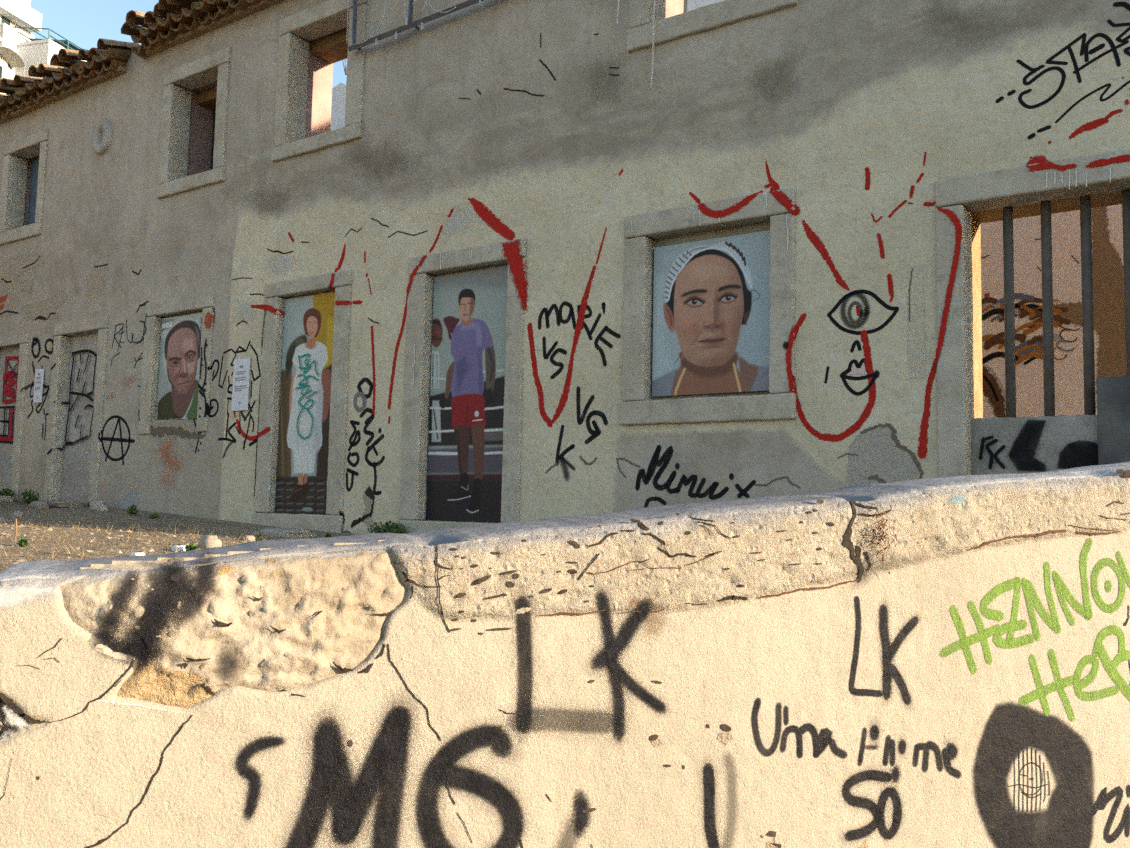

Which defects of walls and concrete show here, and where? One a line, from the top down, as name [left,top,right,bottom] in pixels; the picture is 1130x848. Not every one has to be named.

spalling [0,485,407,713]
crack [371,544,452,741]
crack [536,499,891,617]
spalling [845,423,924,487]
crack [967,469,1130,551]
peeling [0,697,28,737]
crack [85,715,193,848]
crack [446,785,472,843]